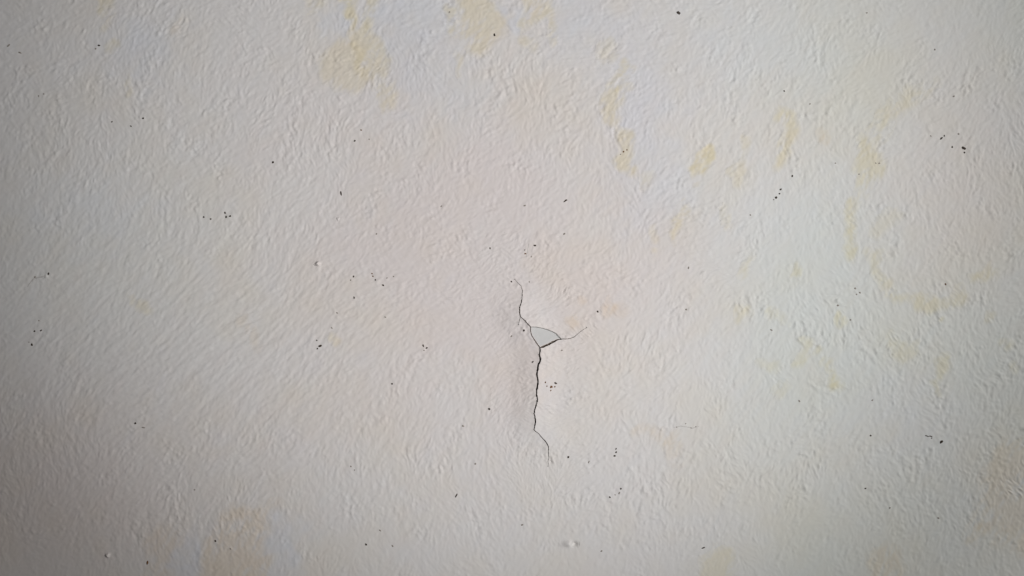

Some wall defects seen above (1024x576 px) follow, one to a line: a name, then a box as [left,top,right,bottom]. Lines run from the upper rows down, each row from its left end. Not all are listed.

crack [515,279,587,466]